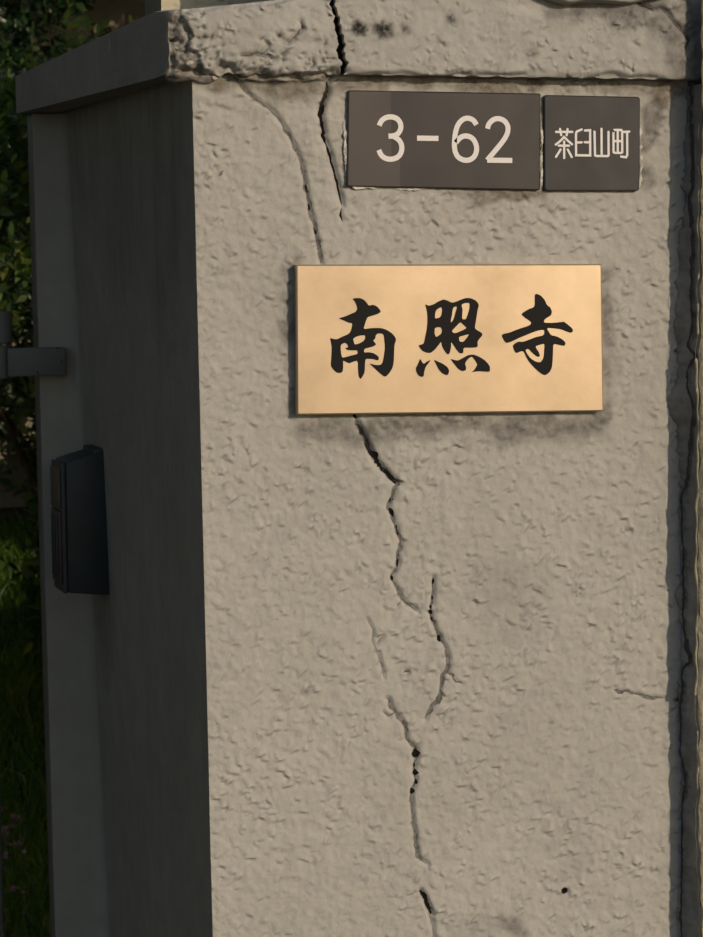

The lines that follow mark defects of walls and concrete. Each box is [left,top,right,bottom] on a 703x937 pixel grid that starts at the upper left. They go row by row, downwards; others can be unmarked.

crack [241,23,303,58]
crack [236,78,323,263]
crack [318,0,346,220]
crack [614,83,697,937]
crack [353,414,462,864]
crack [419,890,434,937]